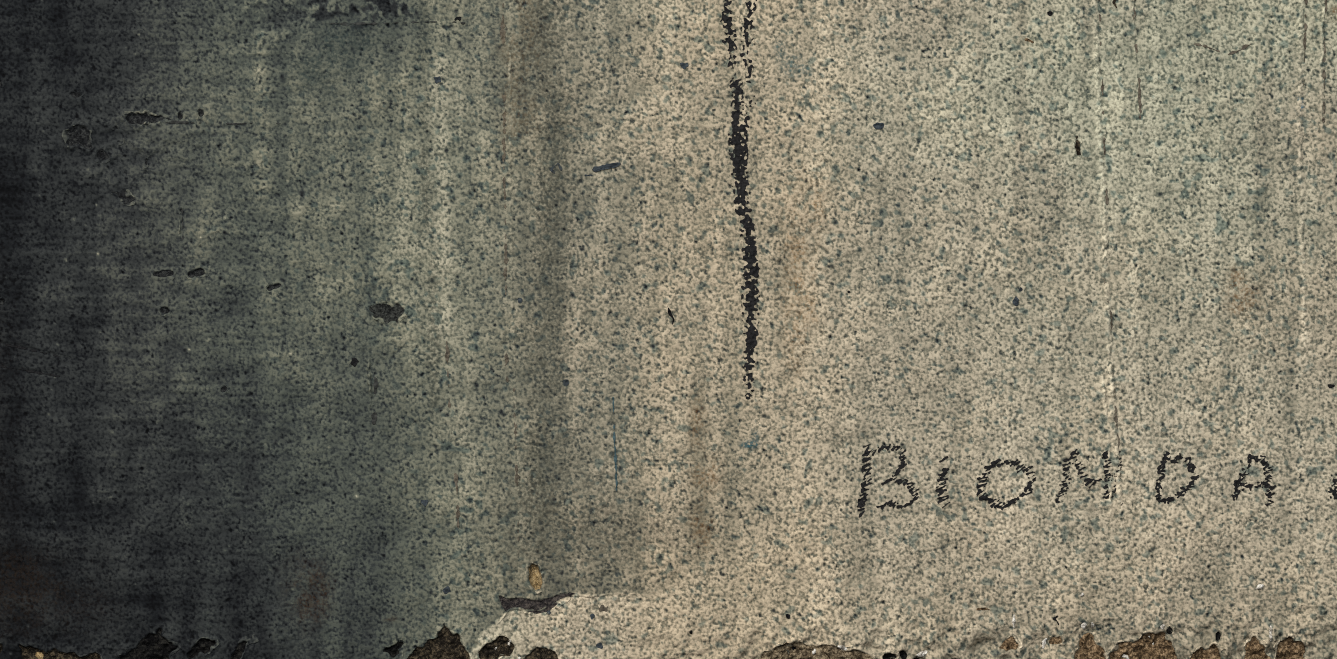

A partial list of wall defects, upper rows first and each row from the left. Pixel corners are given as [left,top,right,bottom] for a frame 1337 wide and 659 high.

crack [1098,0,1142,119]
crack [1099,79,1107,155]
crack [1113,370,1123,506]
spalling [383,562,652,659]
spalling [19,644,103,659]
spalling [119,633,220,659]
spalling [759,639,900,659]
spalling [999,635,1023,651]
spalling [1049,625,1226,659]
spalling [1244,631,1307,659]